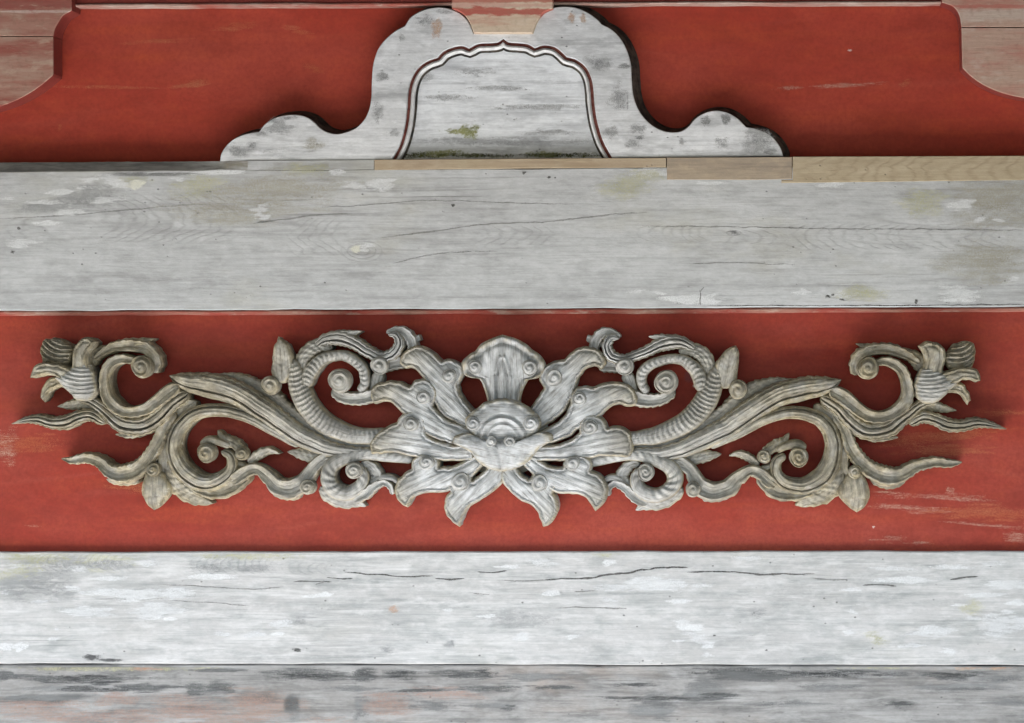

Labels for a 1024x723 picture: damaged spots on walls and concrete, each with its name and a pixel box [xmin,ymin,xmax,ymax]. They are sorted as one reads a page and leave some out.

crack [250,200,1017,264]
peeling [869,487,1024,542]
crack [145,566,896,609]